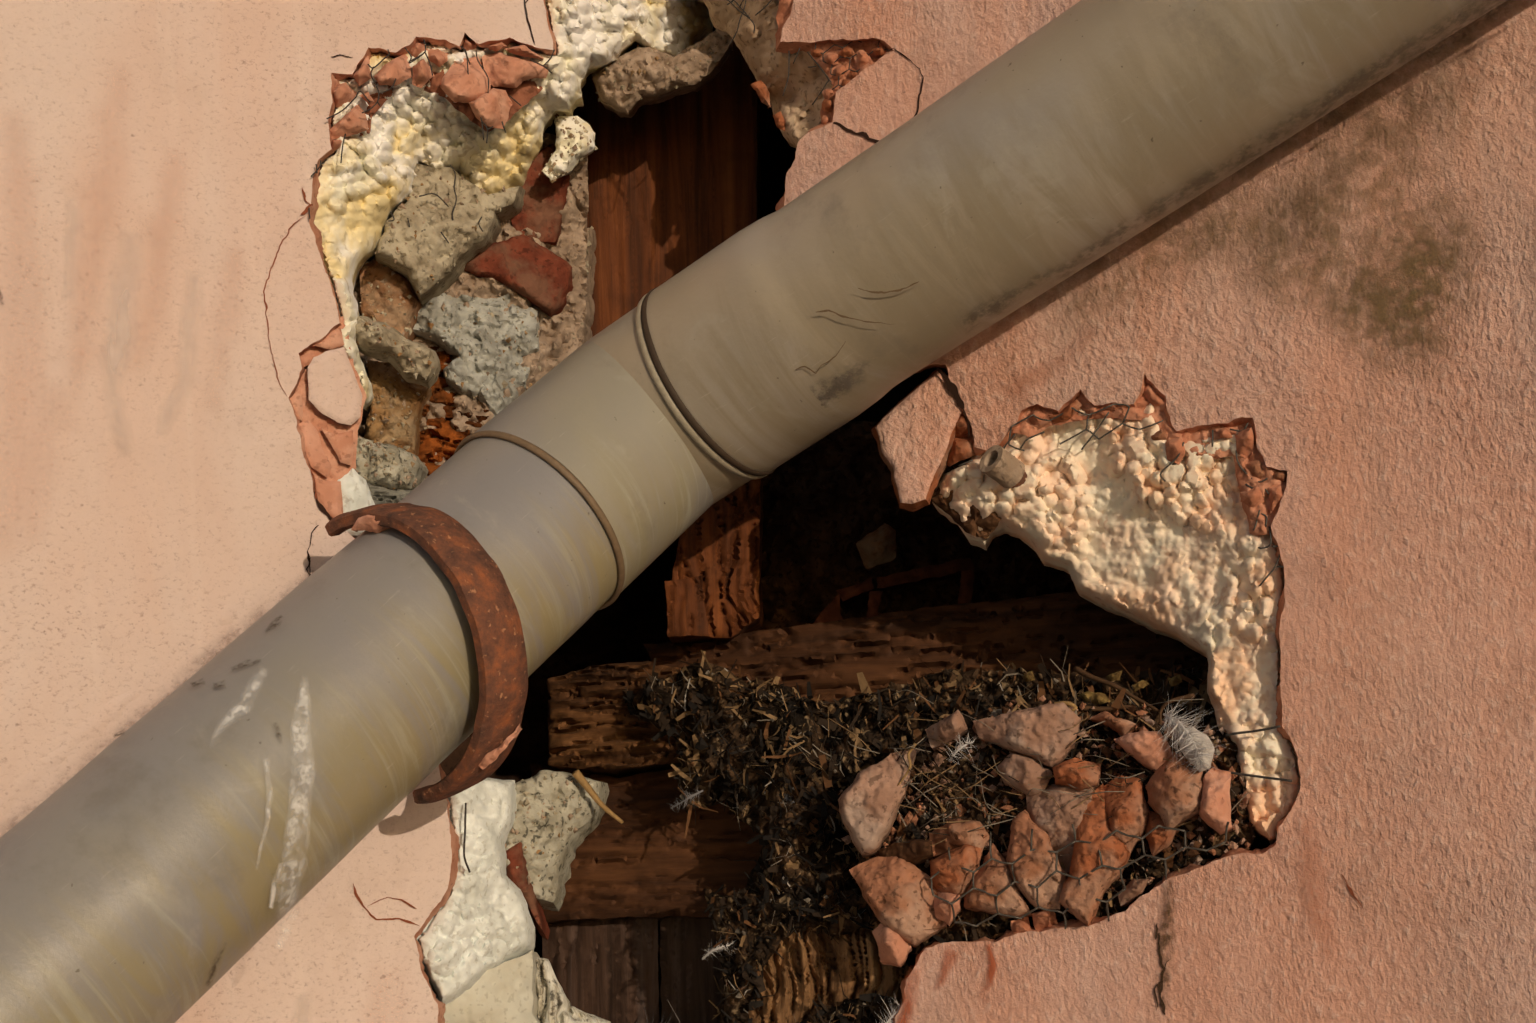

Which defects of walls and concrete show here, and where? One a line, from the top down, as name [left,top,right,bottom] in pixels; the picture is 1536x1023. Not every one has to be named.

spalling [320,37,549,170]
spalling [759,98,796,219]
spalling [800,40,887,124]
crack [833,122,879,143]
crack [886,48,924,116]
crack [263,188,313,396]
peeling [290,317,367,545]
spalling [849,367,948,422]
spalling [1012,384,1287,536]
spalling [487,537,679,783]
spalling [534,925,542,958]
crack [1154,924,1169,1015]